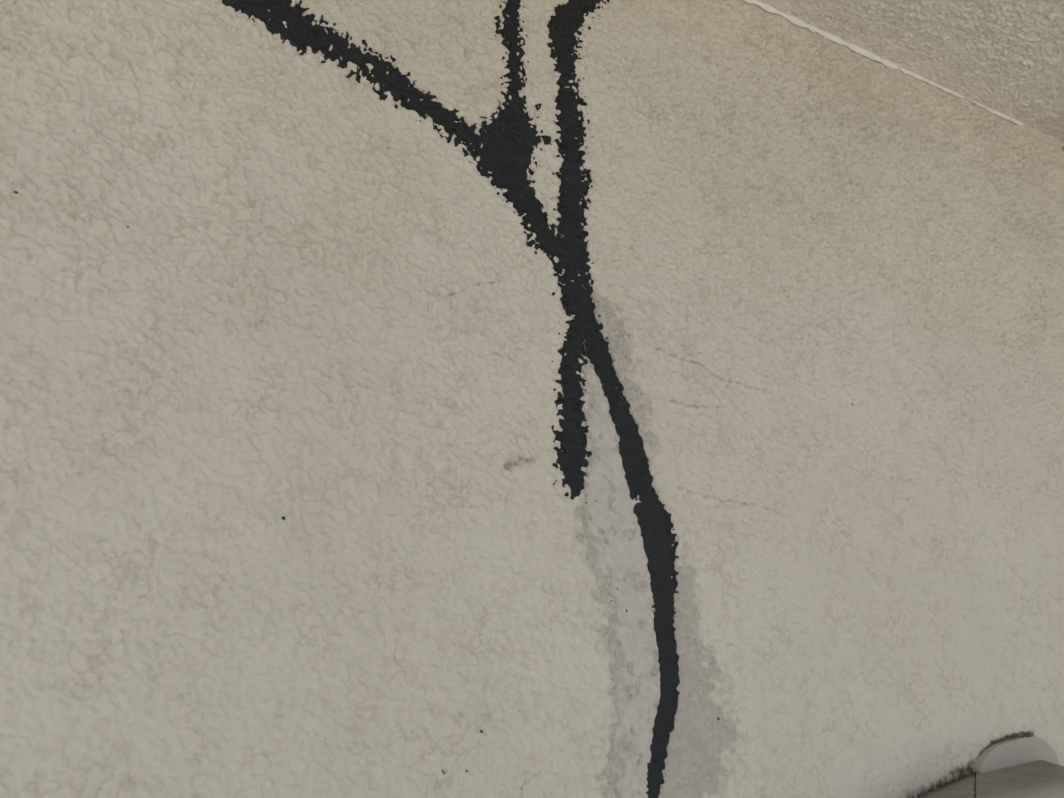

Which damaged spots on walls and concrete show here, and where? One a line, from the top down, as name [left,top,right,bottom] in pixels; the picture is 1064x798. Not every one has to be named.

crack [222,0,680,798]